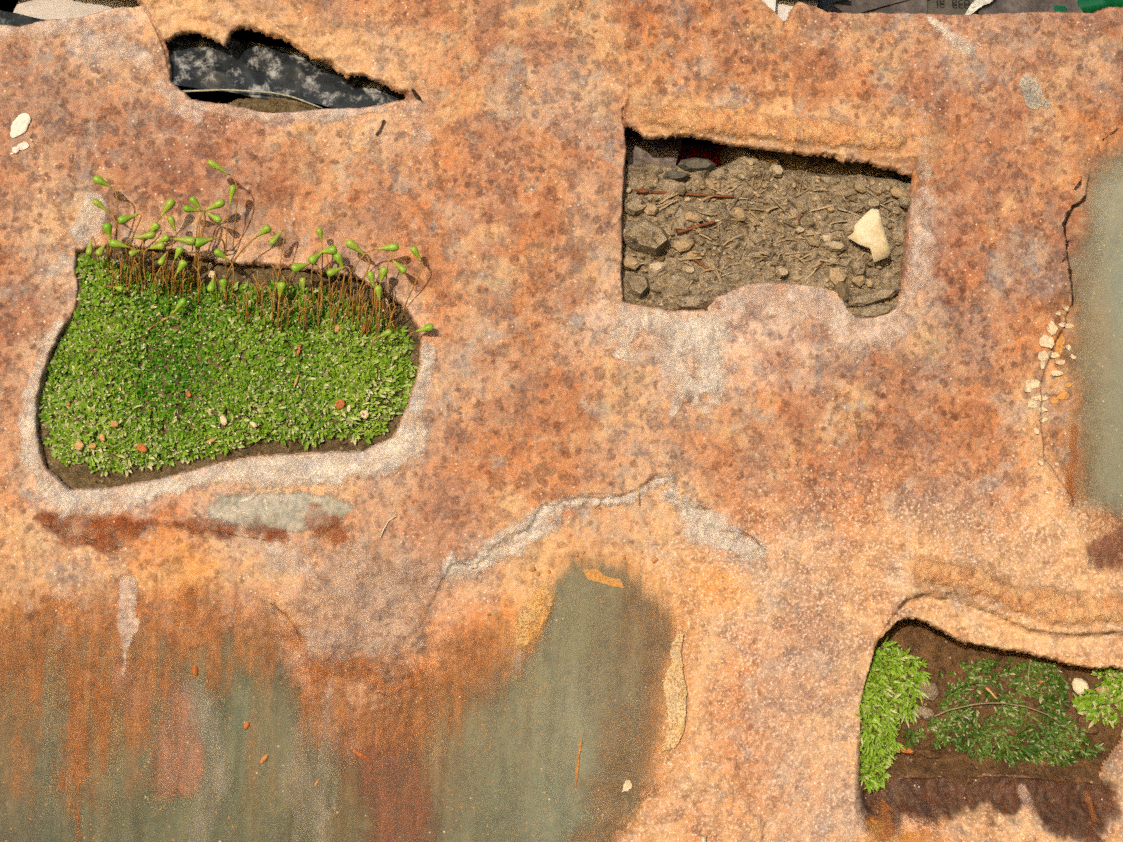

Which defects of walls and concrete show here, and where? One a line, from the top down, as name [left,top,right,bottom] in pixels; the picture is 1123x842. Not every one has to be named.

crack [1062,177,1086,306]
corrosion [662,294,715,309]
corrosion [849,288,902,307]
corrosion [37,511,158,552]
corrosion [174,518,286,543]
leakage [266,541,312,574]
corrosion [310,516,345,542]
corrosion [1088,525,1123,569]
leakage [118,576,140,670]
corrosion [0,587,274,794]
peeling [1072,678,1089,695]
corrosion [575,739,583,792]